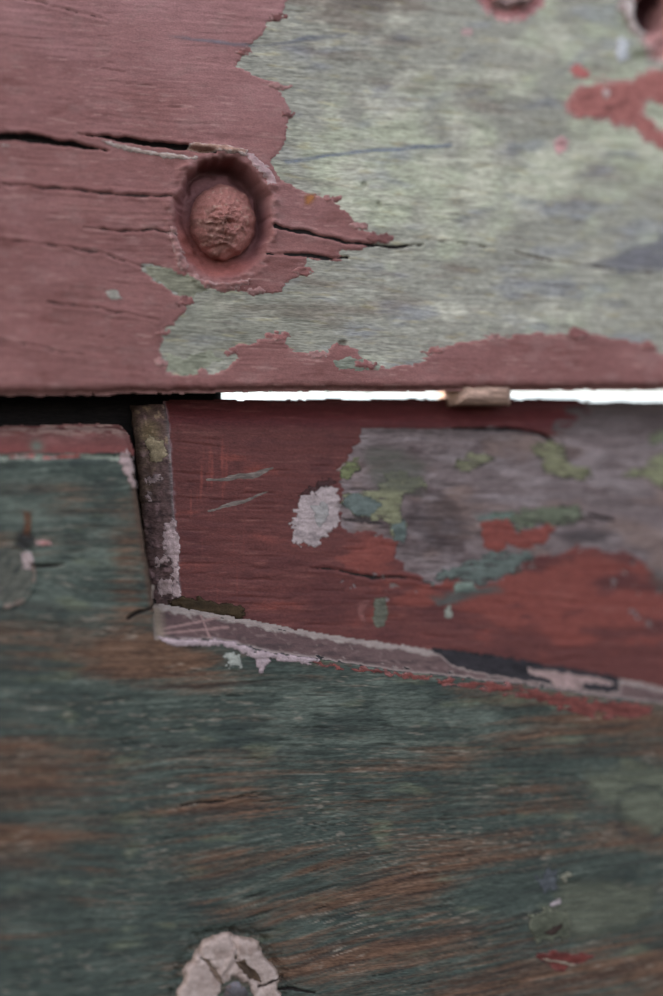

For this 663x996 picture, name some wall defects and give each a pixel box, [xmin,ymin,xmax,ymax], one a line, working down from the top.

peeling [268,13,288,22]
peeling [476,0,544,23]
peeling [563,0,663,150]
crack [0,133,248,159]
crack [1,183,172,198]
crack [46,228,177,268]
peeling [349,222,394,244]
peeling [288,478,382,548]
peeling [480,518,557,553]
peeling [454,581,476,594]
peeling [372,597,389,628]
peeling [313,647,654,720]